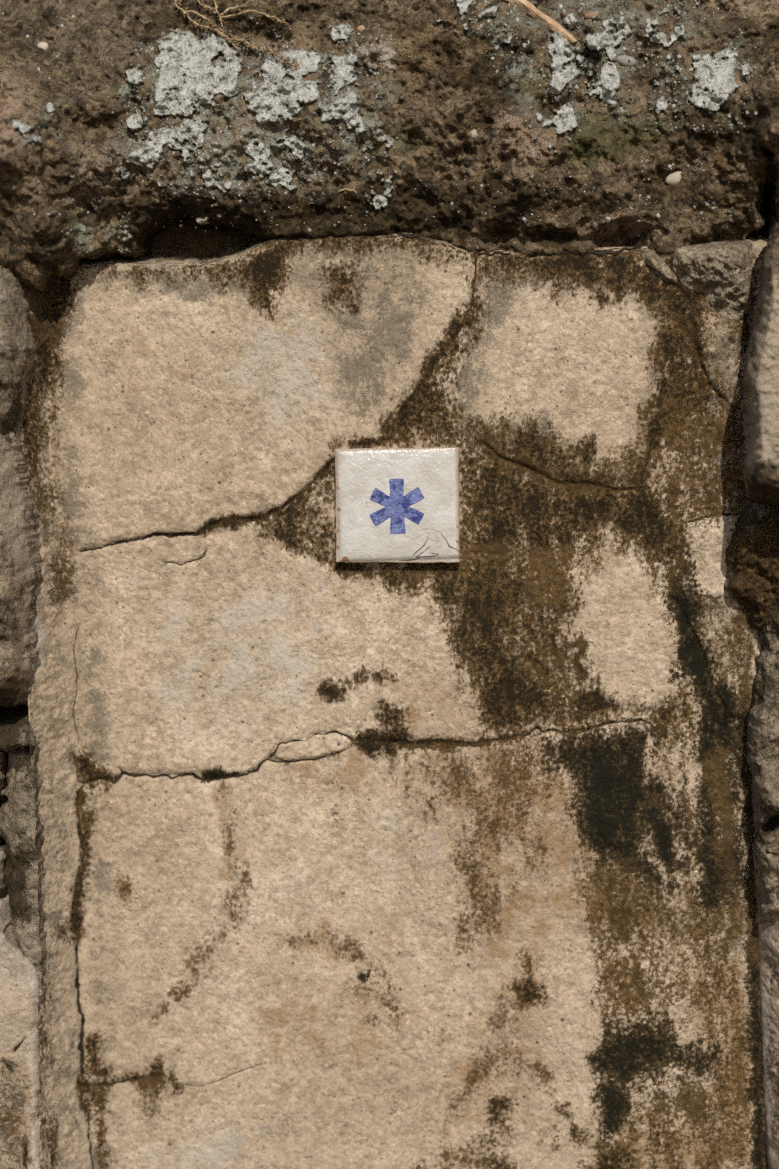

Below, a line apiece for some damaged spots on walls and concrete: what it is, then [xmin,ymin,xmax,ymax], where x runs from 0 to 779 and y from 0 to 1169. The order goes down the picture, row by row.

crack [549,245,643,255]
crack [388,251,520,431]
damp [692,313,750,403]
crack [80,473,320,565]
damp [464,544,591,705]
damp [451,827,549,954]
crack [74,718,651,1169]
damp [508,947,548,1010]
damp [624,708,767,1169]
crack [2,1039,24,1072]
damp [589,1073,632,1141]
crack [21,1145,29,1169]